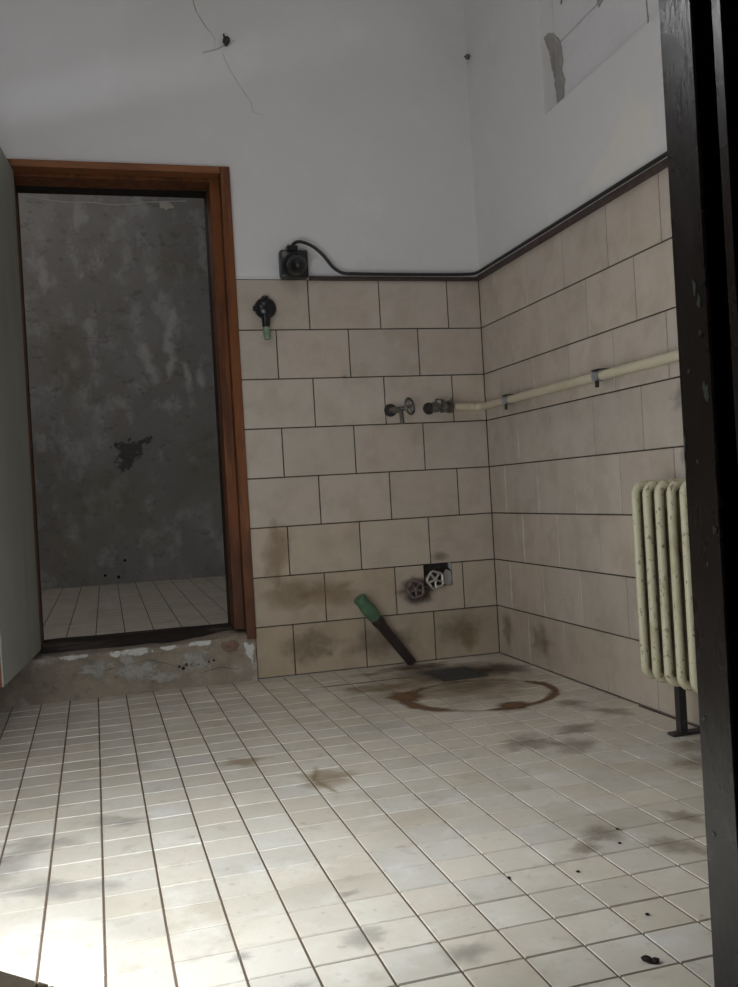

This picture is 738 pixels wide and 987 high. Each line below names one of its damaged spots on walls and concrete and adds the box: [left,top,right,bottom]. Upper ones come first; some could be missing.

leakage [33,271,224,582]
peeling [59,640,255,683]
rust [388,688,447,711]
rust [491,681,558,710]